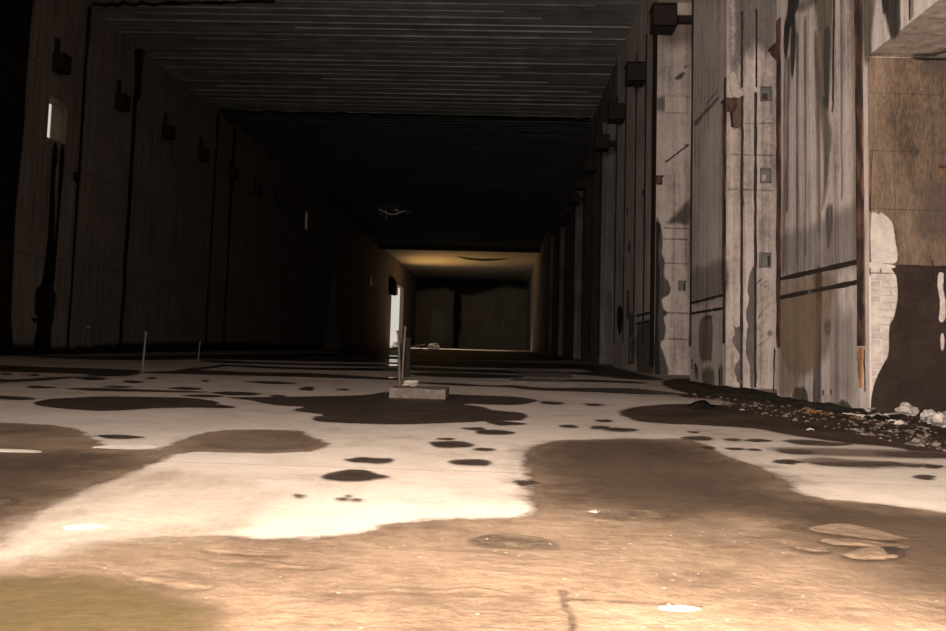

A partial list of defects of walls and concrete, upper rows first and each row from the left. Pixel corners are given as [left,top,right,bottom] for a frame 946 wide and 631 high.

water stain [0,0,946,467]
peeling [869,212,898,269]
water stain [0,422,946,631]